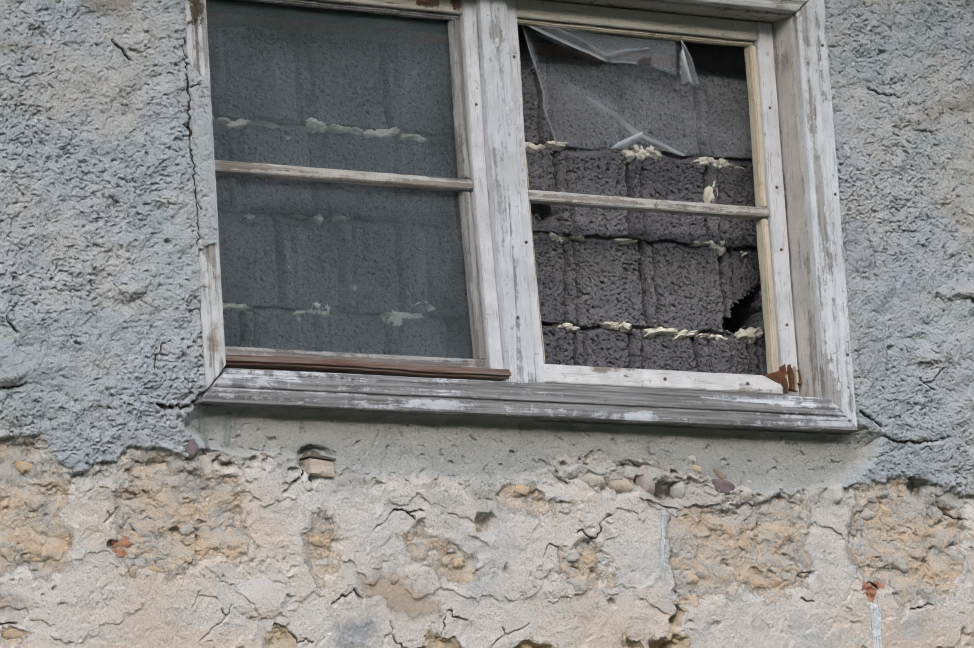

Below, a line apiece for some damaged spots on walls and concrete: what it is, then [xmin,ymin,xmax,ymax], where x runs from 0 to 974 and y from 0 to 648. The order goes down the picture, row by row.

crack [182,38,202,246]
spalling [0,437,74,581]
spalling [107,452,259,580]
spalling [301,510,342,588]
spalling [398,517,479,585]
spalling [495,483,576,517]
spalling [550,450,812,648]
spalling [847,478,971,606]
spalling [0,625,31,648]
spalling [264,622,302,648]
spalling [422,628,461,648]
spalling [514,635,559,648]